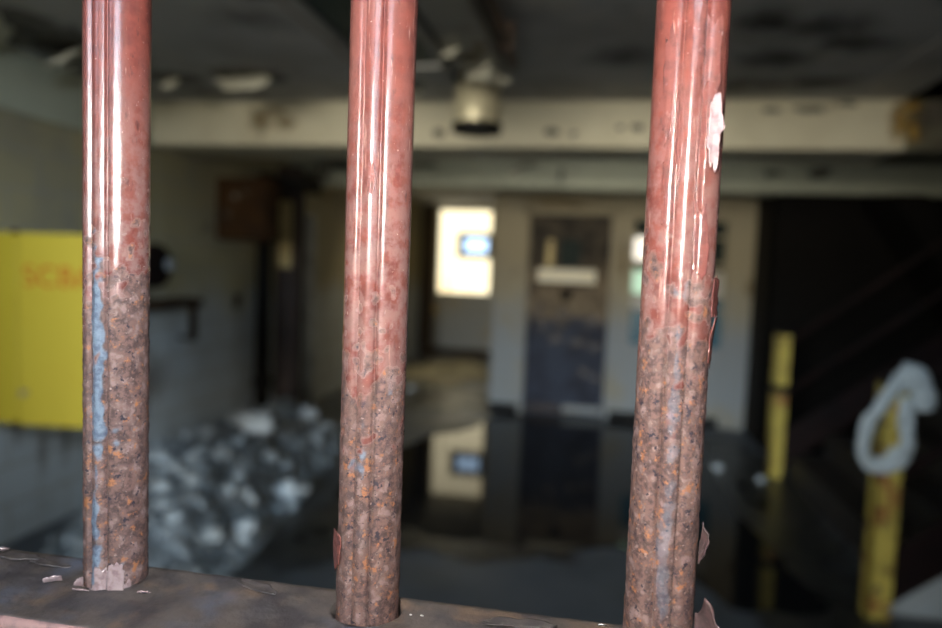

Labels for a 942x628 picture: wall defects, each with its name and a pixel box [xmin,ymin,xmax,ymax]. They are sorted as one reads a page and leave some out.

peeling [661,0,725,369]
peeling [74,562,131,591]
peeling [694,598,720,628]